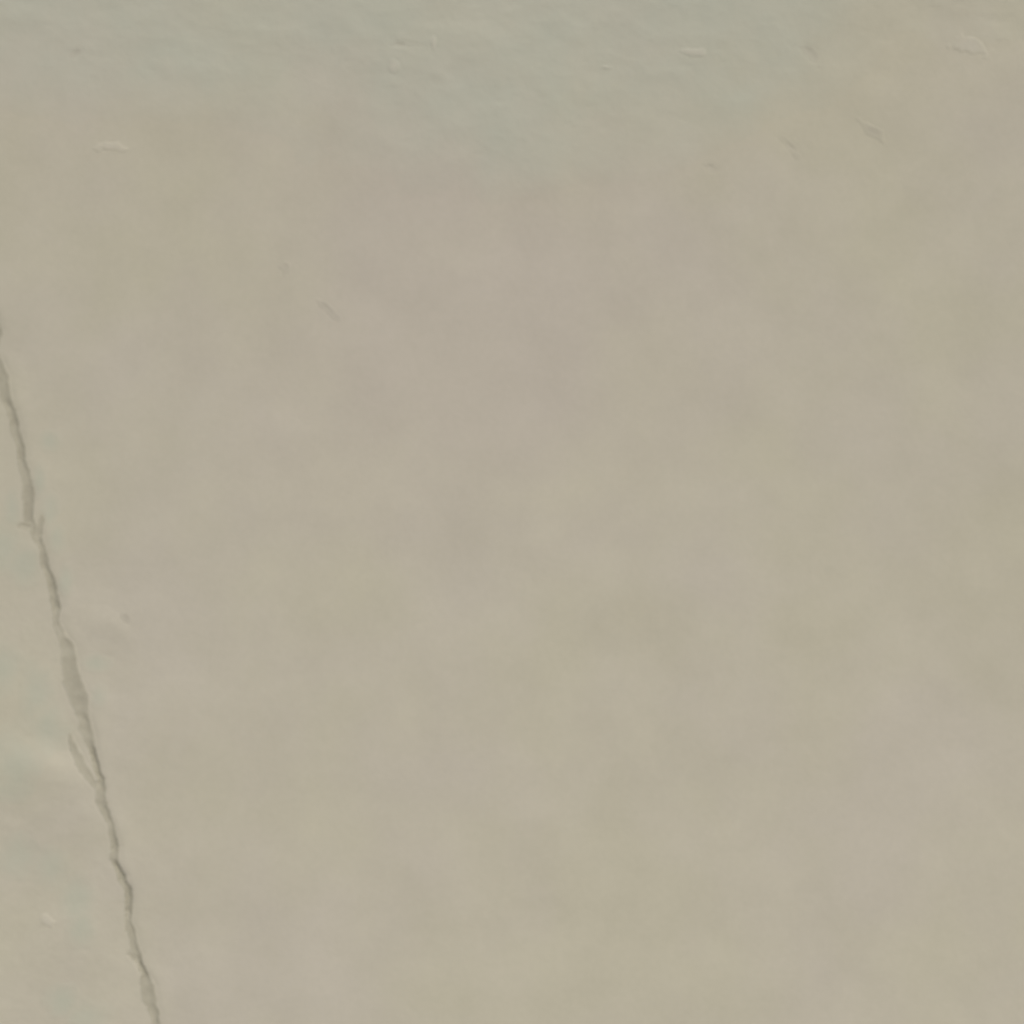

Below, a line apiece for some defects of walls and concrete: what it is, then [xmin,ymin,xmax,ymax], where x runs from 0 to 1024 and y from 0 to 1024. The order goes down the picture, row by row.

crack [0,324,162,1024]